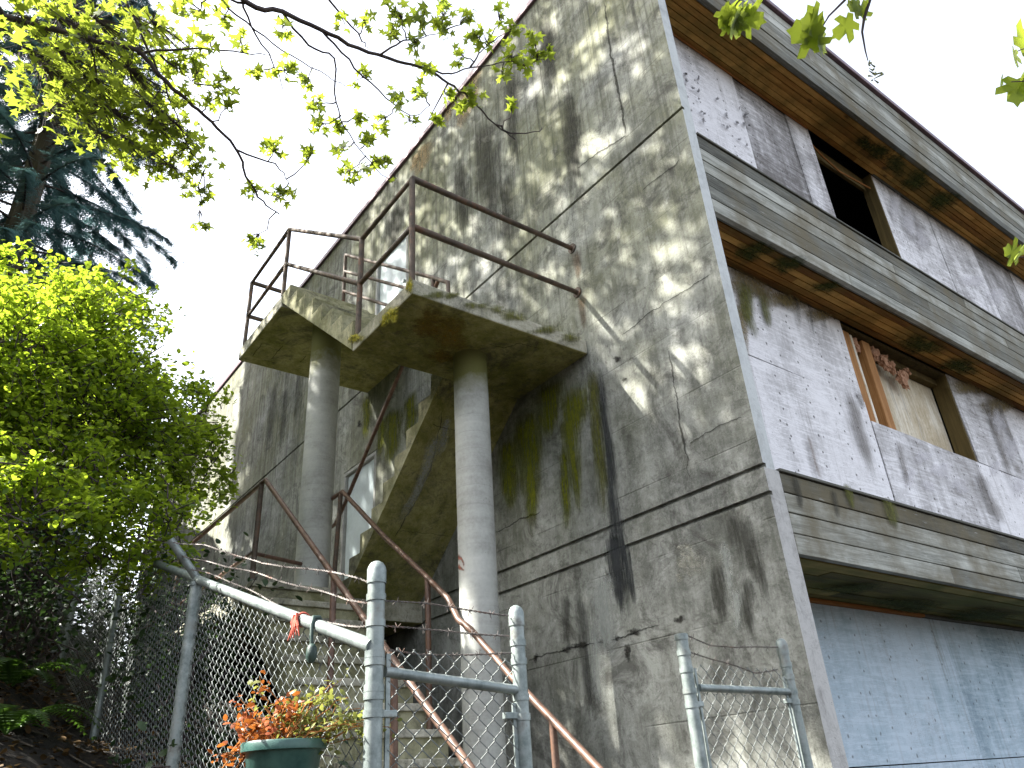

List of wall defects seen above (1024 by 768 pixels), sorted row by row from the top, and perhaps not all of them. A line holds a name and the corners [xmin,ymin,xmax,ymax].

crack [578,5,626,168]
water stain [500,383,563,523]
water stain [560,450,570,522]
water stain [564,377,635,695]
crack [669,354,742,478]
water stain [712,520,765,632]